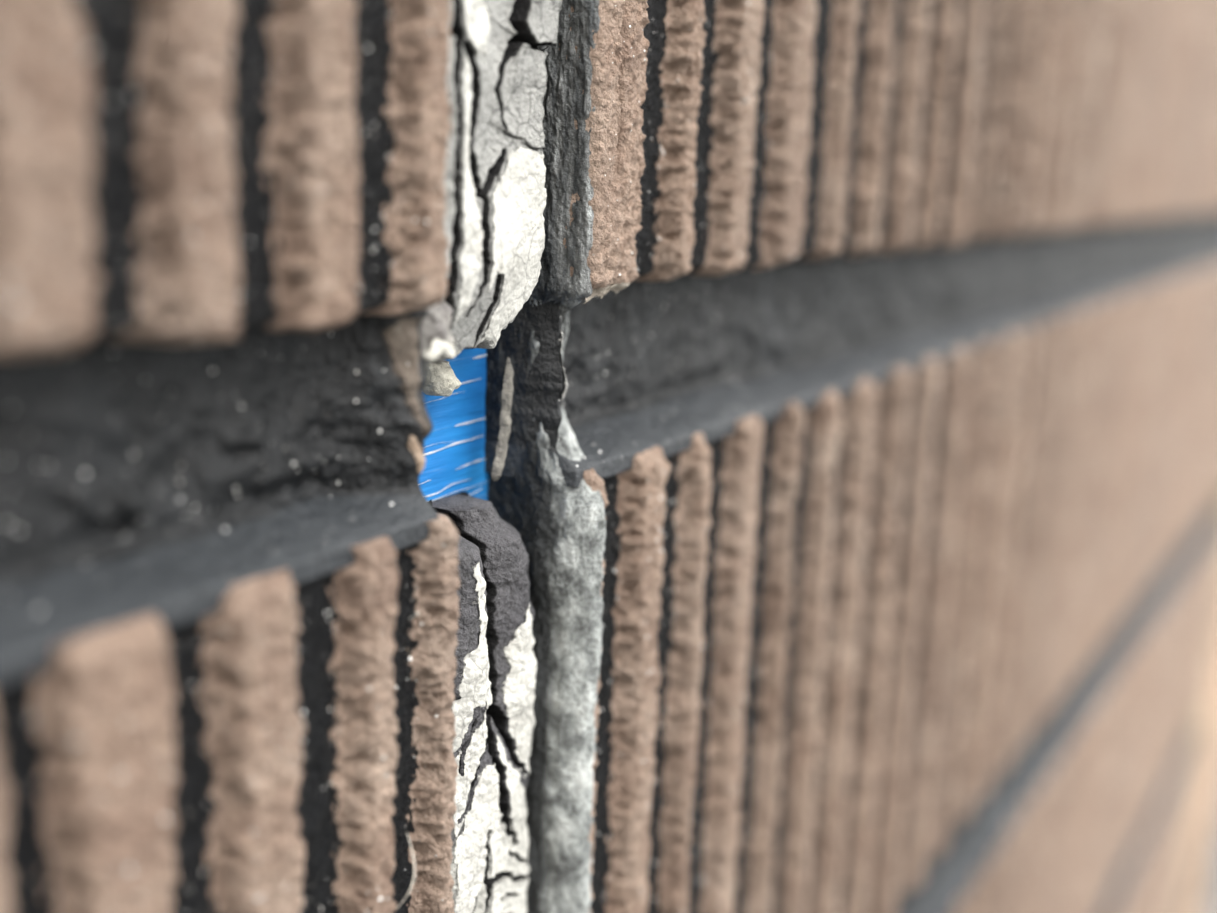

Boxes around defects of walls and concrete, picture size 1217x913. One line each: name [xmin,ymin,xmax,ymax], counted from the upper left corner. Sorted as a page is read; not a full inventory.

crack [485,0,549,51]
peeling [424,339,455,361]
crack [483,853,531,894]